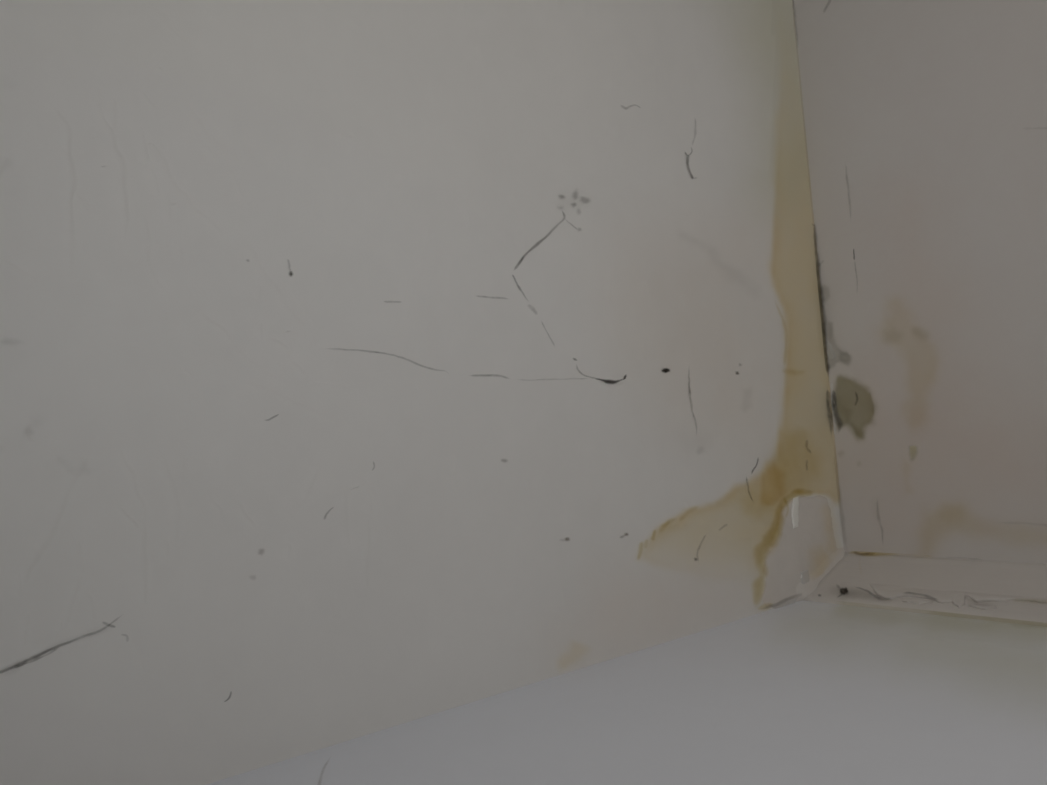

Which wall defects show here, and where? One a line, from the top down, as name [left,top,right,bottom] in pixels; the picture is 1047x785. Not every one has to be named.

peeling [762,495,837,609]